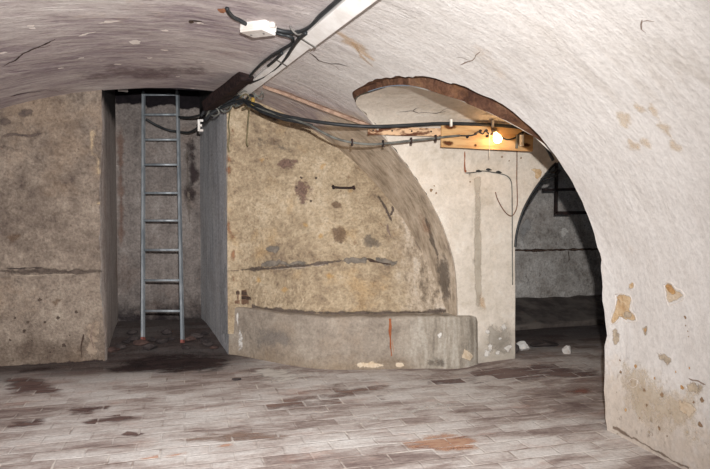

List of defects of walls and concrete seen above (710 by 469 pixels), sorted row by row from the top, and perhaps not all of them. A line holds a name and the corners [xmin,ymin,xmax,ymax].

crack [6,39,55,65]
crack [3,267,96,275]
crack [234,260,341,271]
flaking render [664,282,685,306]
flaking render [610,282,647,344]